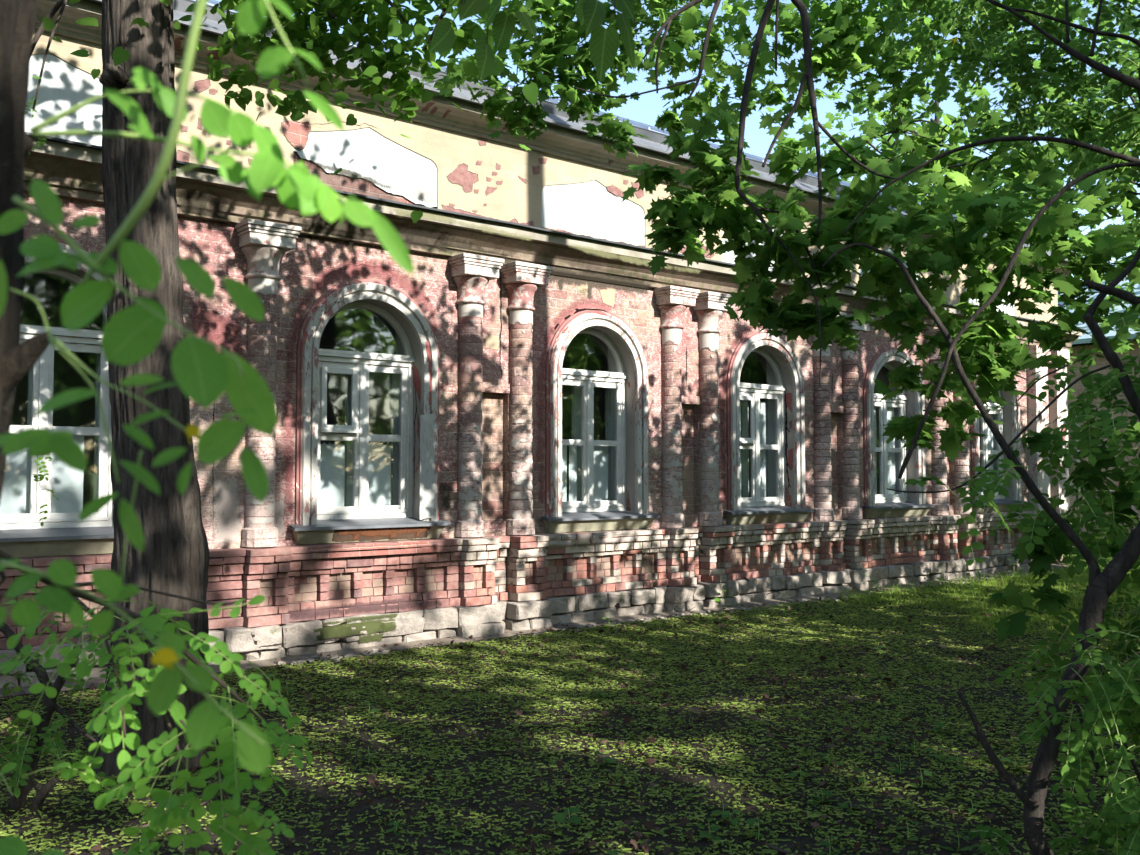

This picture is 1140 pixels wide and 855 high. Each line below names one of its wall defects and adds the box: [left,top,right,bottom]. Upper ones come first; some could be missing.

flaking render [281,120,645,247]
leakage [288,599,442,643]